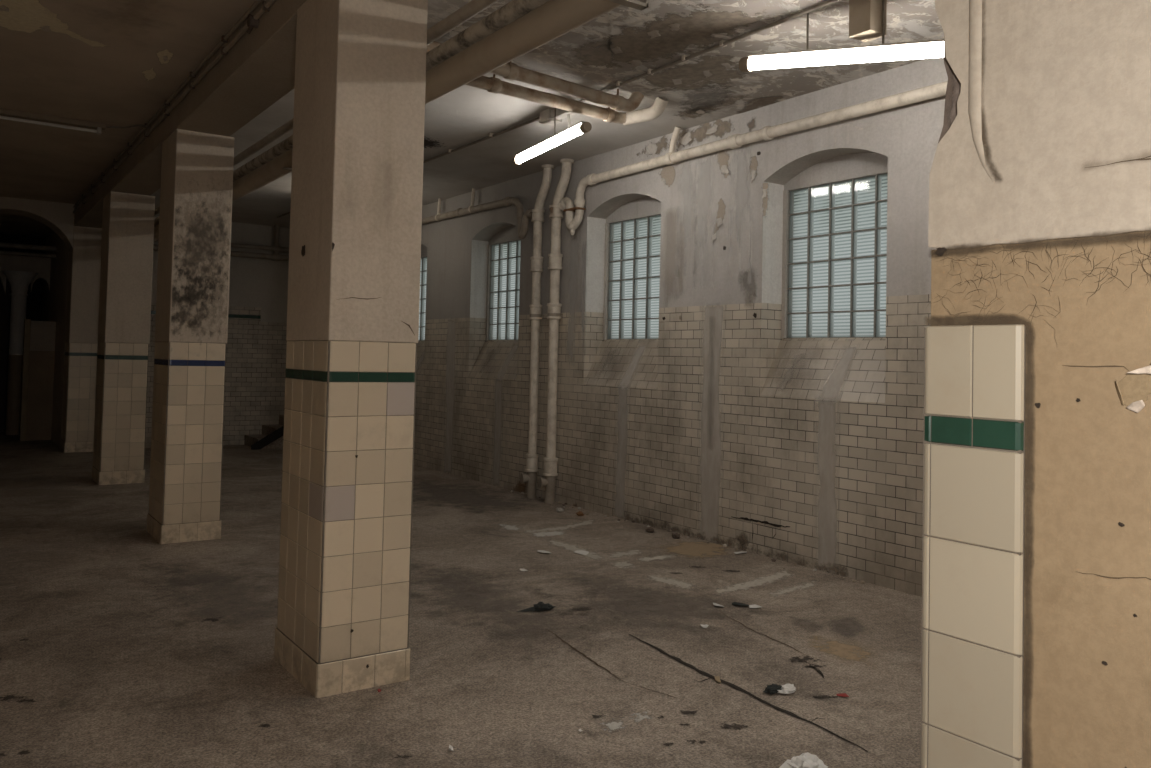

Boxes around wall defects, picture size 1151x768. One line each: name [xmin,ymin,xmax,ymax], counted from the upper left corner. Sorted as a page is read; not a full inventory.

peeling [0,0,110,47]
peeling [573,4,771,187]
crack [1085,156,1151,168]
water stain [171,203,227,334]
crack [926,239,1151,344]
peeling [1063,365,1151,413]
crack [731,516,790,540]
crack [1079,572,1151,580]
crack [545,628,869,752]